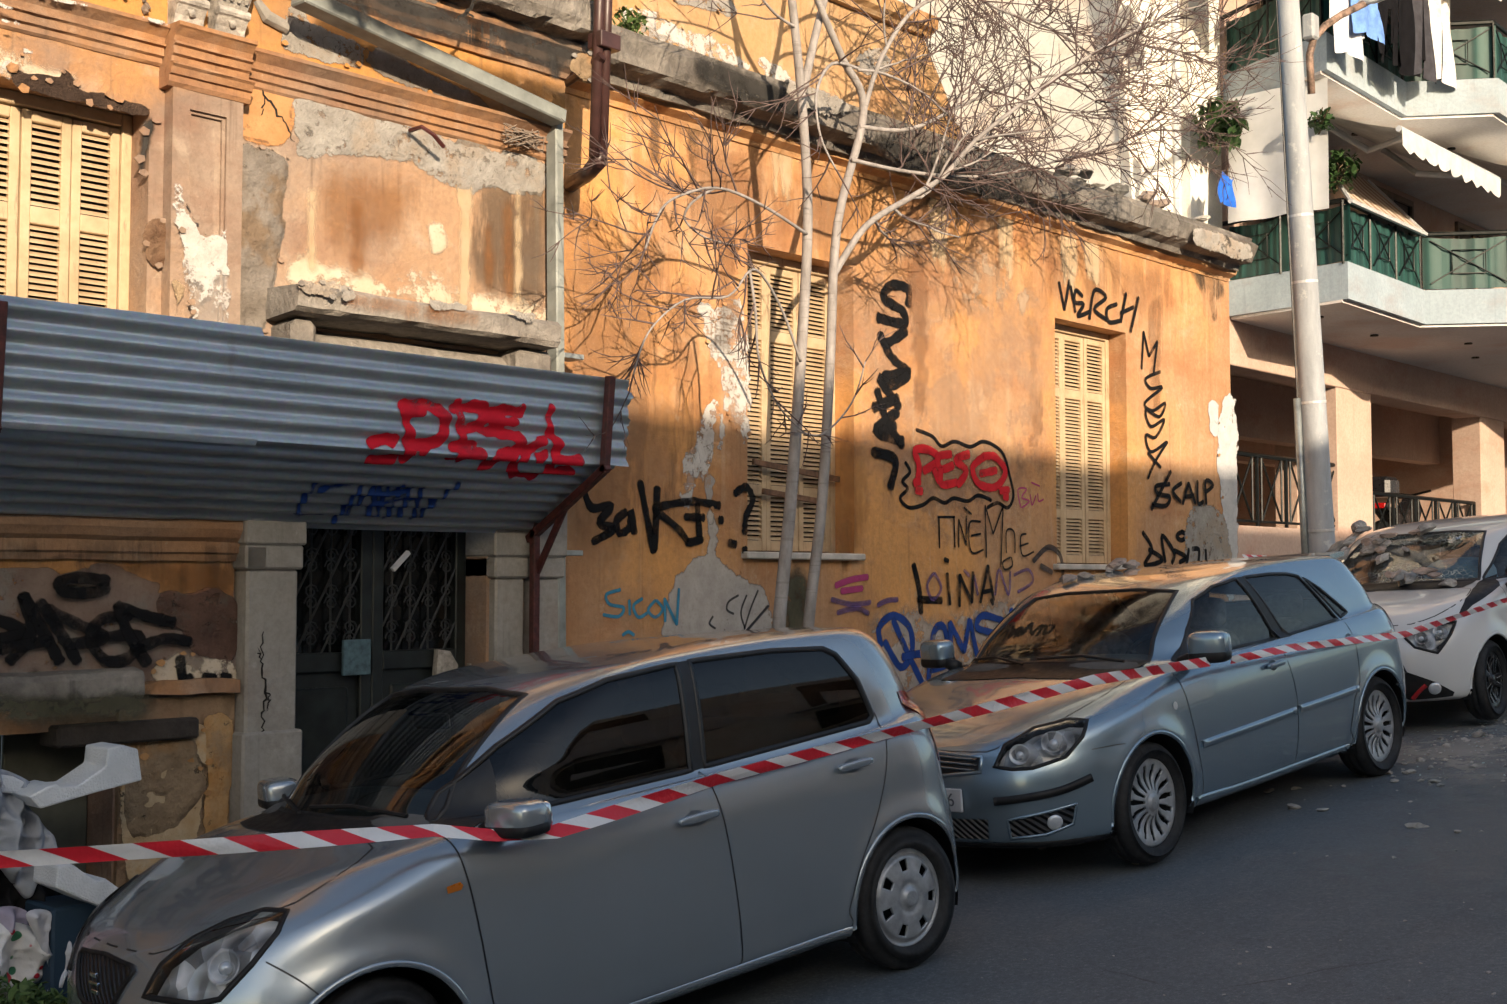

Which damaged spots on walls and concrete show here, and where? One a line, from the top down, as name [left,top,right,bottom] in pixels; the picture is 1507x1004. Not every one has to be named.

spalling [0,48,125,111]
flaking render [623,0,851,117]
peeling [452,139,490,181]
flaking render [142,143,290,333]
flaking render [679,298,753,524]
flaking render [1208,393,1239,559]
flaking render [151,587,237,681]
crack [257,631,271,732]
flaking render [119,724,211,880]